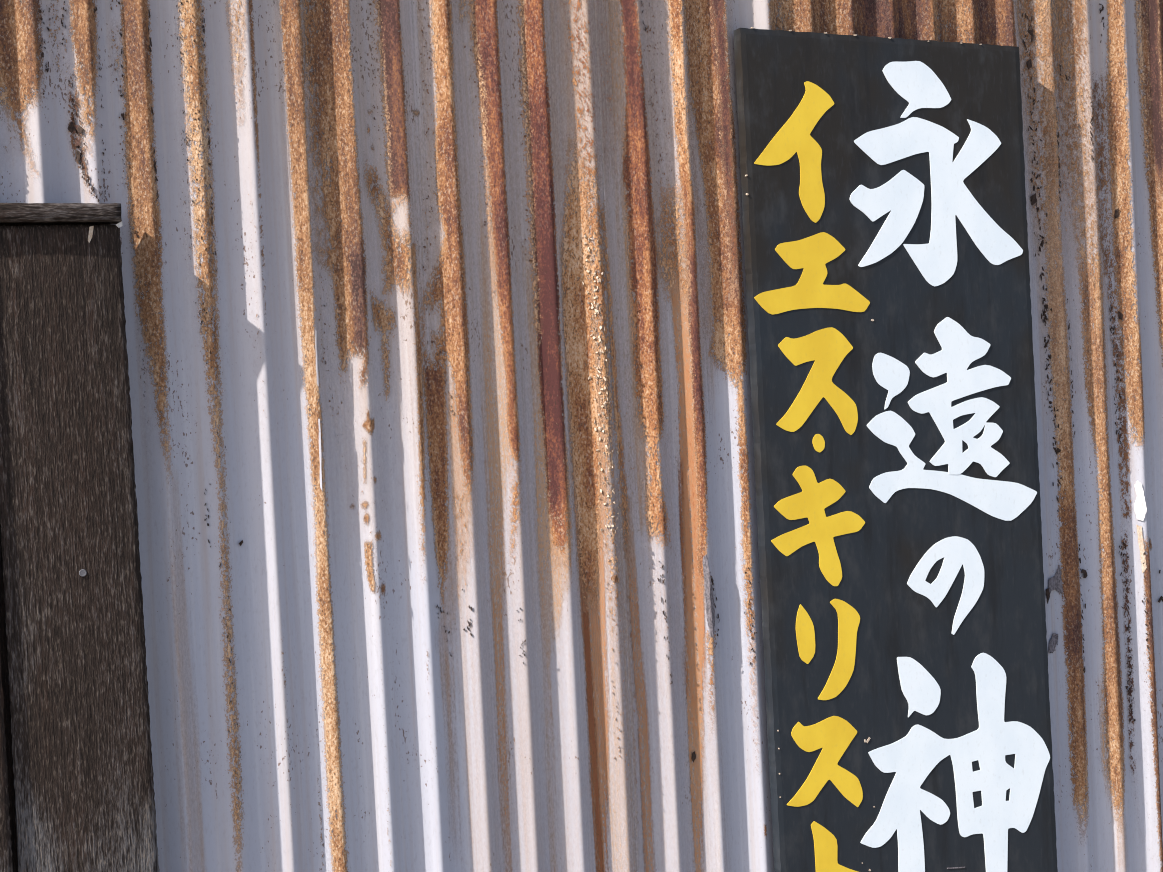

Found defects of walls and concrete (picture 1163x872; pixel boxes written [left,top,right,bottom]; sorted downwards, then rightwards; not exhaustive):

corrosion [0,0,49,151]
corrosion [66,0,174,469]
corrosion [176,0,244,872]
corrosion [230,0,266,292]
corrosion [274,0,757,872]
corrosion [767,0,1017,47]
corrosion [1035,0,1163,872]